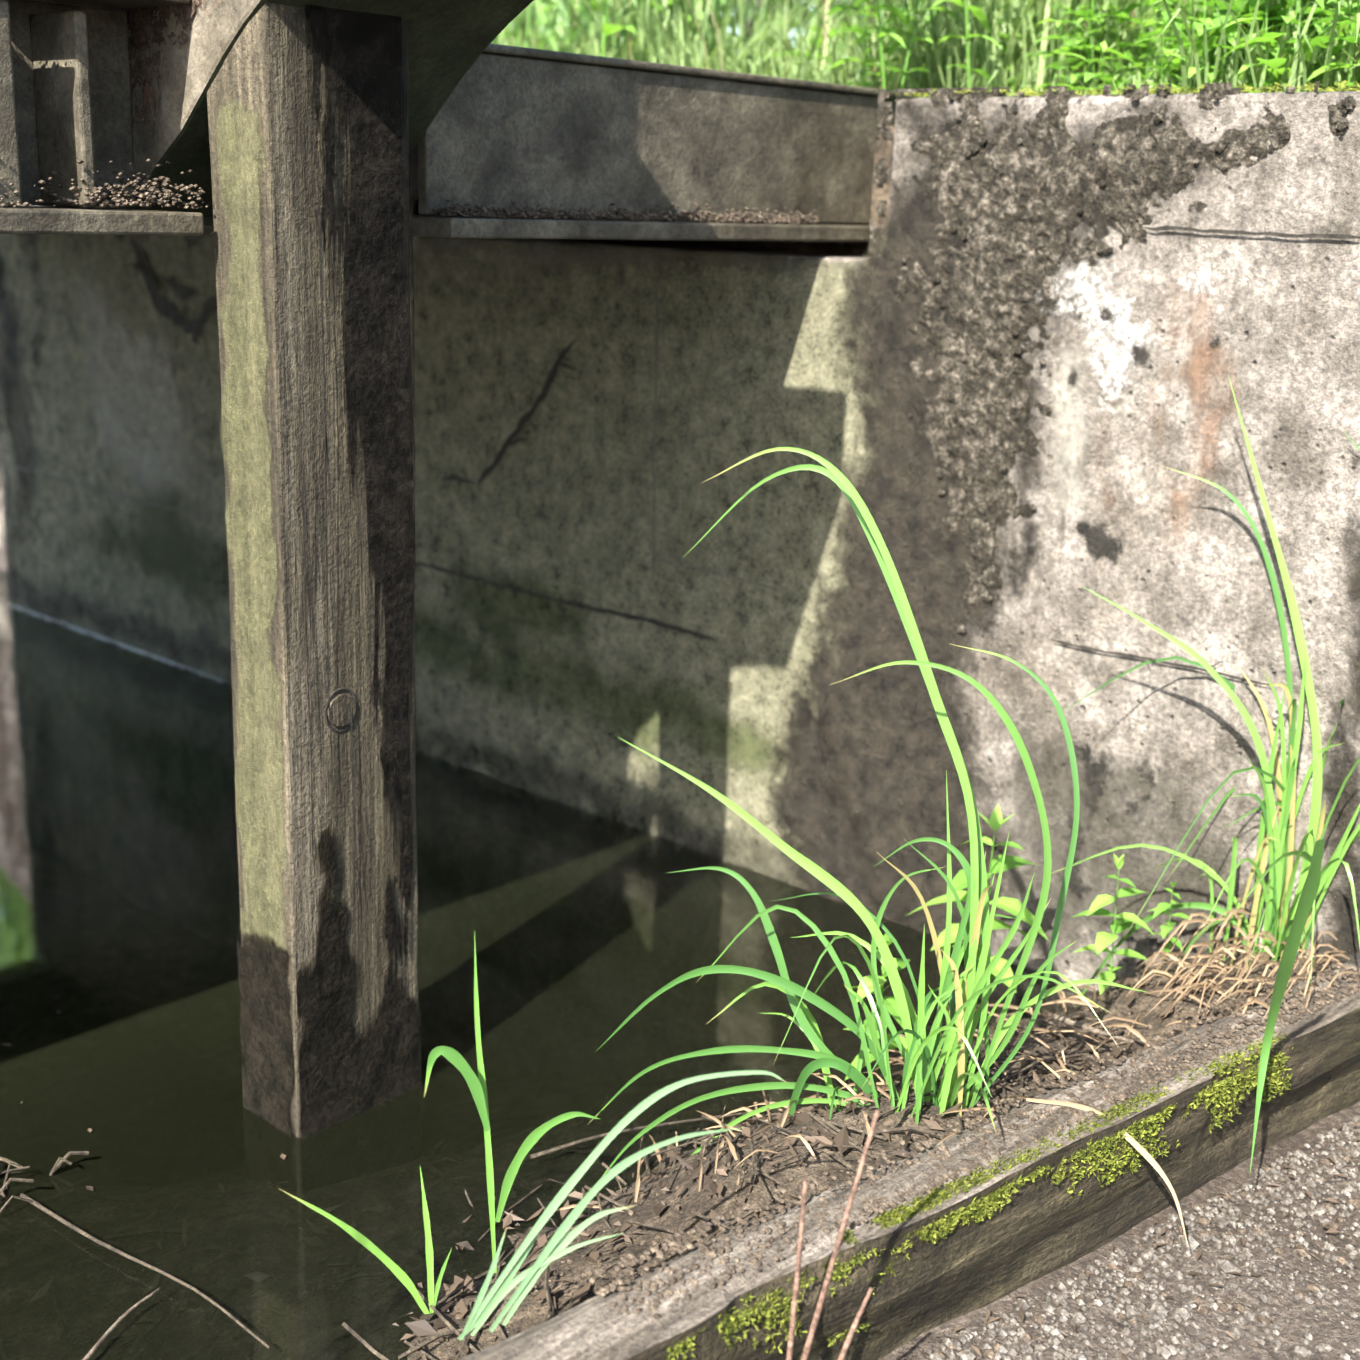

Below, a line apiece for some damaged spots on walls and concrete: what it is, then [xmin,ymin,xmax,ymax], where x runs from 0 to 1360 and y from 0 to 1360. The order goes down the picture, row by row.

spalling [1328,95,1356,137]
crack [441,339,577,486]
spalling [869,83,1291,604]
crack [415,561,716,641]
leakage [586,99,1216,1001]
crack [1052,640,1269,685]